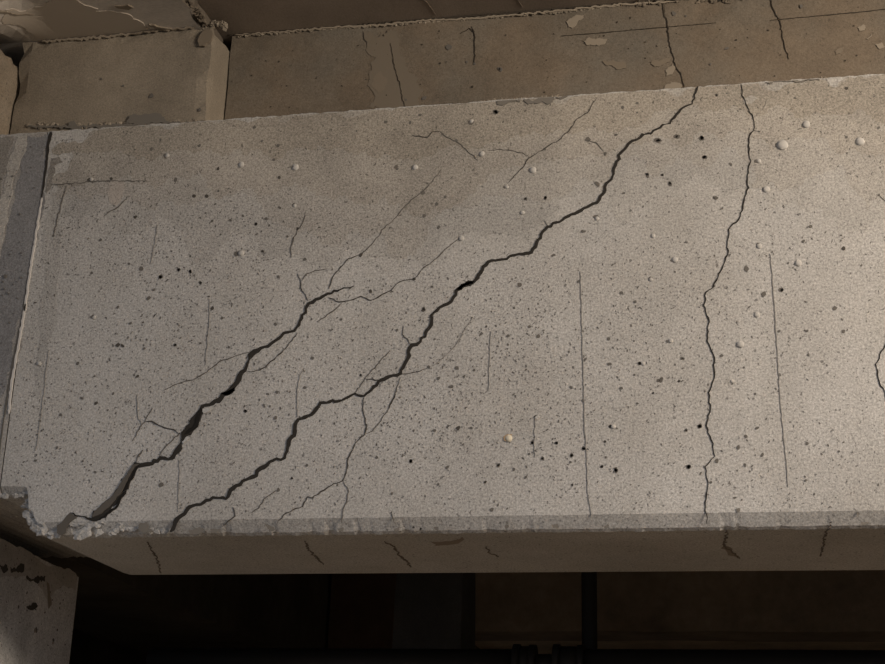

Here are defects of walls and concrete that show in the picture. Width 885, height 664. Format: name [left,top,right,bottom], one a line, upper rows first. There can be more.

crack [0,131,143,451]
spalling [92,464,139,517]
crack [72,7,698,532]
crack [384,515,412,568]
water stain [0,29,885,405]
crack [703,85,768,559]
crack [875,345,885,392]